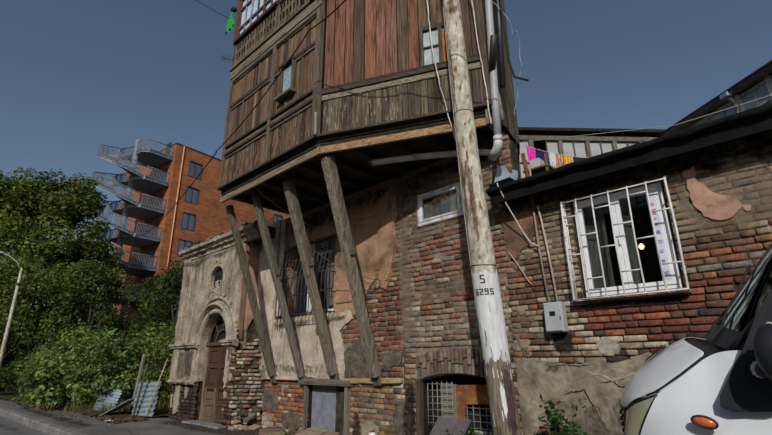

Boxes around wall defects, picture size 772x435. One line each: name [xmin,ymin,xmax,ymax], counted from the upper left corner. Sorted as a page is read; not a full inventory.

flaking render [682,167,752,221]
crack [543,364,636,414]